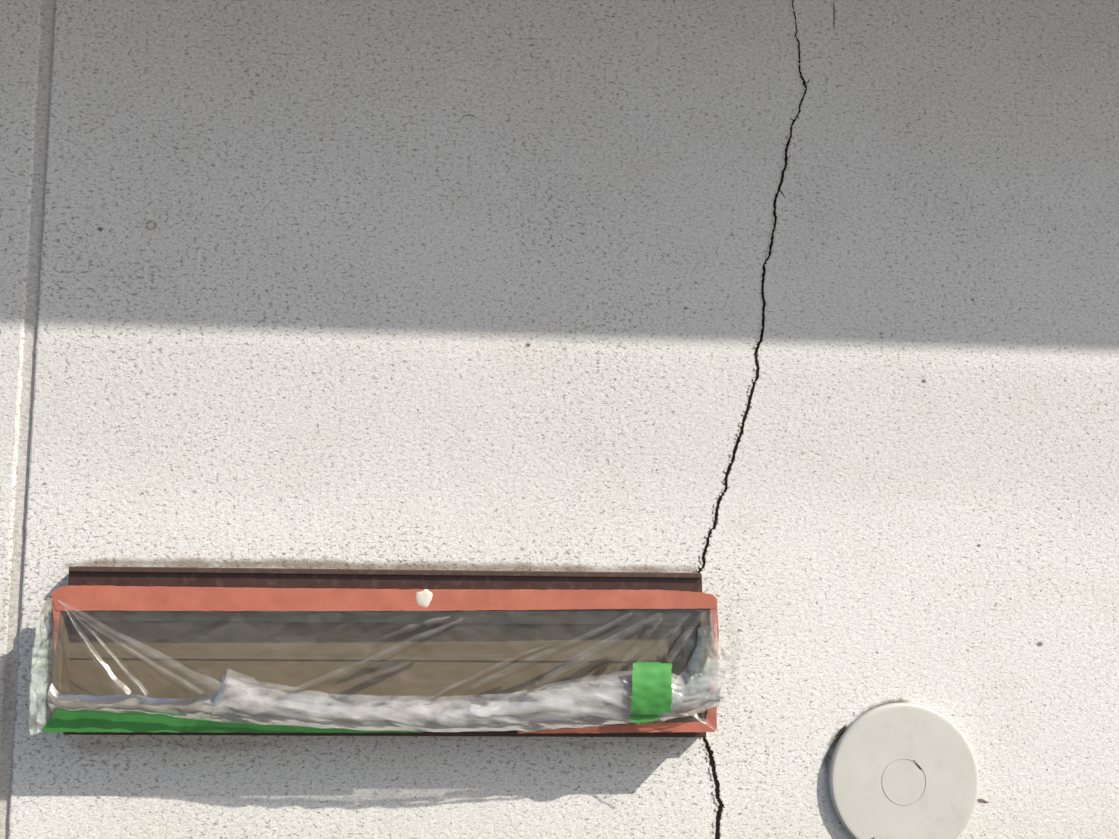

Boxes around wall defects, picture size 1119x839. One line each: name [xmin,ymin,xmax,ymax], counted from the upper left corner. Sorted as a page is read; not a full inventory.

crack [697,0,810,574]
crack [701,736,726,839]